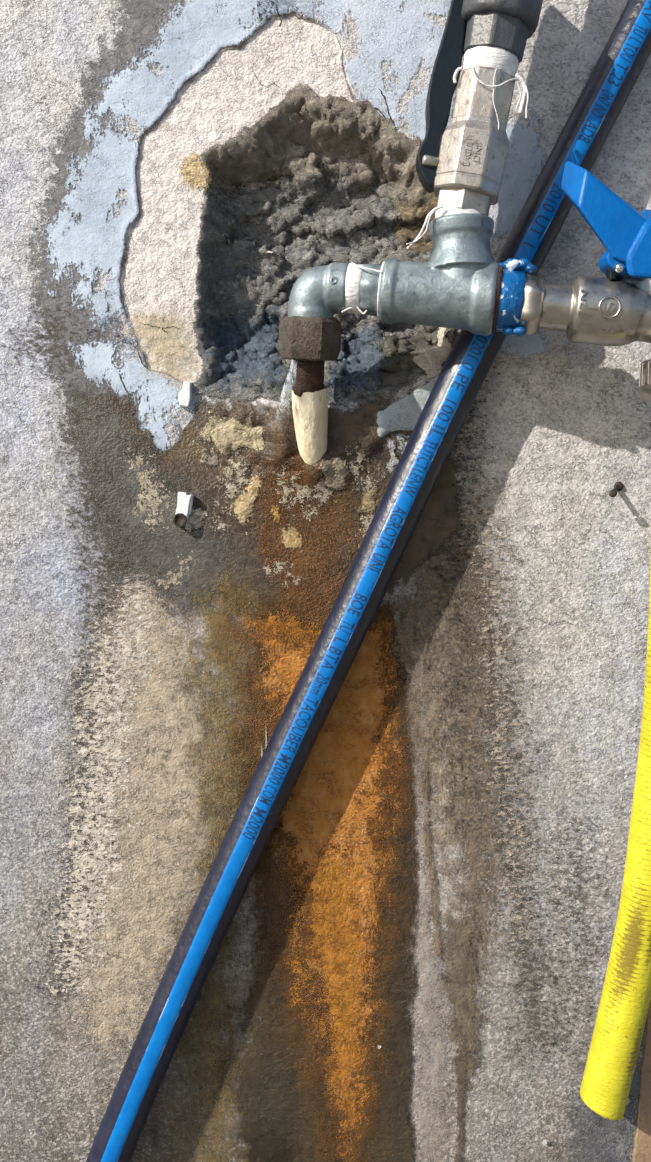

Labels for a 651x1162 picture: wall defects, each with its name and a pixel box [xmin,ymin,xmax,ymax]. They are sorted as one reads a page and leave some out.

water stain [2,0,412,1061]
spalling [37,0,451,456]
rust [234,610,320,787]
rust [257,609,410,1162]
spalling [318,457,350,490]
spalling [324,313,457,515]